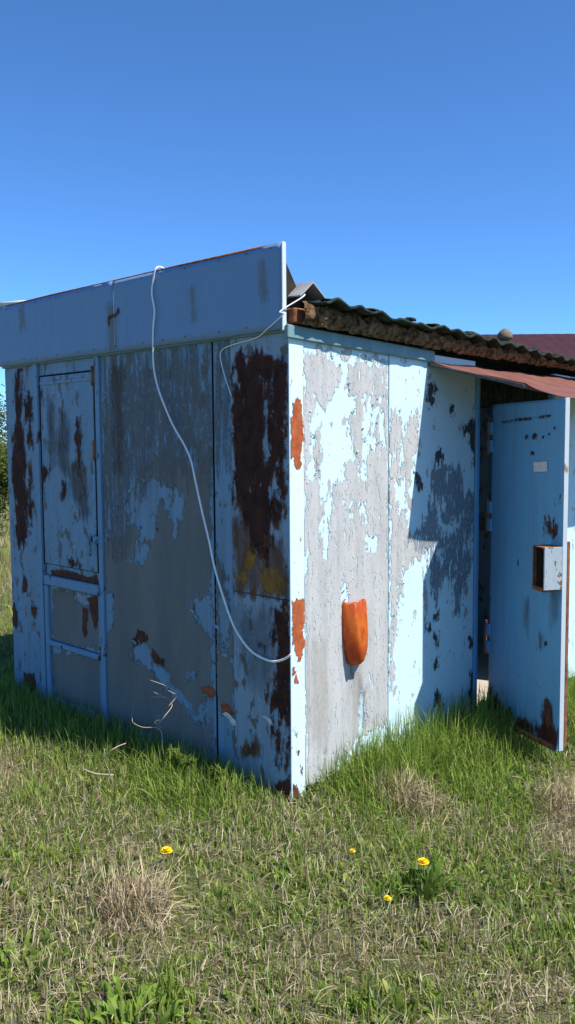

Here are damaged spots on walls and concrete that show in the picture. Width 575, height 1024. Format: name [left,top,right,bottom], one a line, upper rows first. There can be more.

corrosion [9,368,87,552]
corrosion [51,557,99,638]
peeling [51,451,236,757]
corrosion [131,629,164,668]
corrosion [230,344,305,802]
peeling [304,343,475,791]
corrosion [488,687,558,751]
corrosion [543,515,558,541]